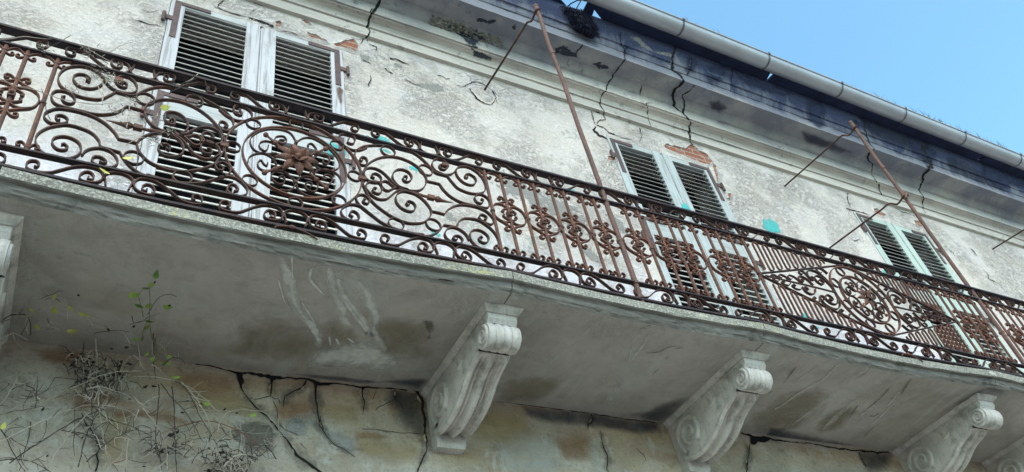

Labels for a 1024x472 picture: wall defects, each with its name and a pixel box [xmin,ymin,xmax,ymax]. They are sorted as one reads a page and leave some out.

flaking render [297,19,370,61]
crack [345,0,500,105]
peeling [417,83,443,92]
crack [591,32,698,150]
flaking render [660,143,734,200]
damp [804,133,837,149]
crack [846,119,934,216]
damp [246,257,410,382]
crack [196,364,428,472]